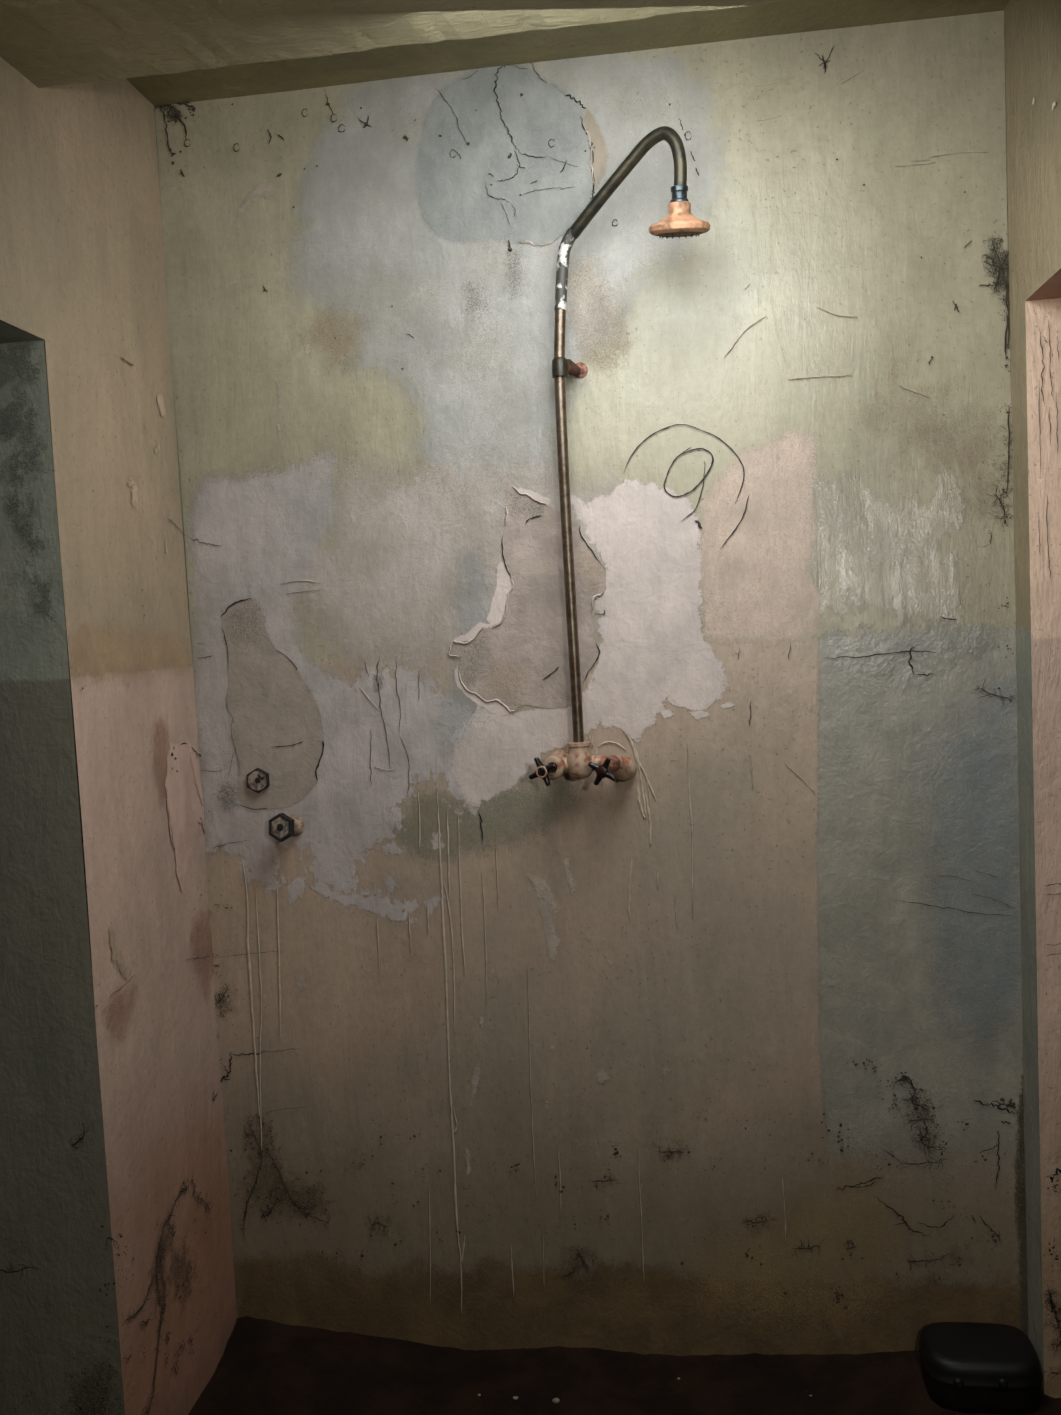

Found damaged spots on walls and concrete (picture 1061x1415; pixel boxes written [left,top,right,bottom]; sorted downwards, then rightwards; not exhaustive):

crack [434,64,595,225]
damp [979,235,1010,372]
damp [0,340,56,636]
peeling [165,47,736,924]
crack [827,646,938,676]
damp [15,645,1061,1415]
crack [836,1097,1016,1243]